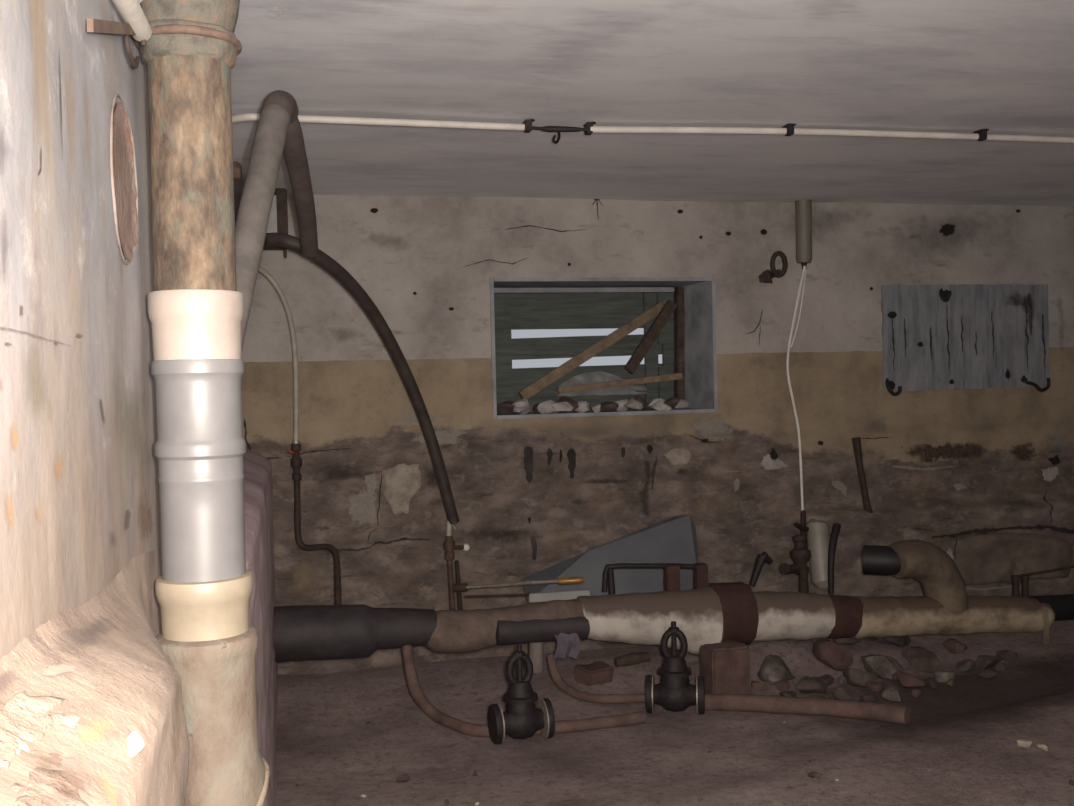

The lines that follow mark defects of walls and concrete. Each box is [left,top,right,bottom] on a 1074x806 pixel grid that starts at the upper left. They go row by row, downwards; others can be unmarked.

crack [0,327,71,346]
spalling [761,447,789,470]
spalling [892,442,981,471]
flaking render [1041,455,1061,482]
flaking render [348,463,436,525]
flaking render [127,731,145,757]
spalling [10,753,89,806]